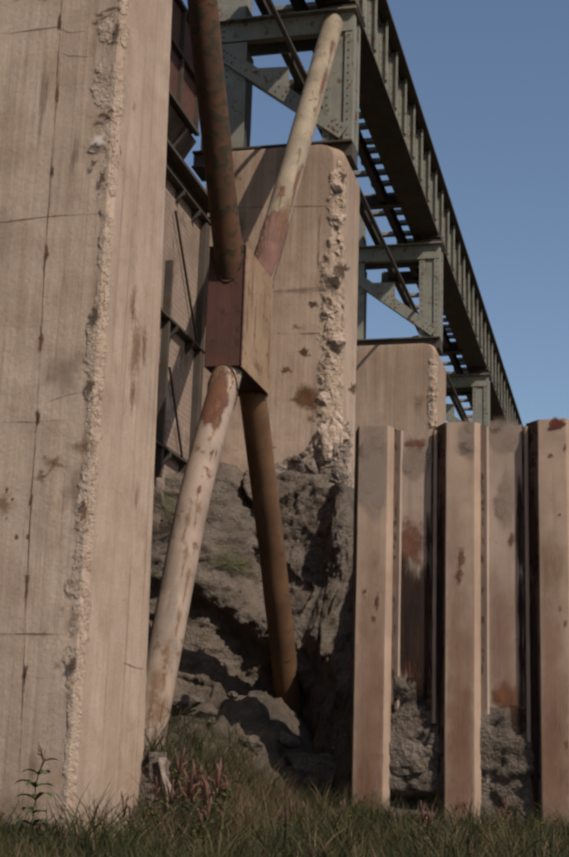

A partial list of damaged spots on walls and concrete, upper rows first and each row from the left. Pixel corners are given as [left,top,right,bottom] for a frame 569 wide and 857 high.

crack [12,5,85,79]
crack [3,150,82,328]
spalling [61,0,130,834]
rust [293,387,319,420]
spalling [275,159,356,487]
crack [10,421,51,723]